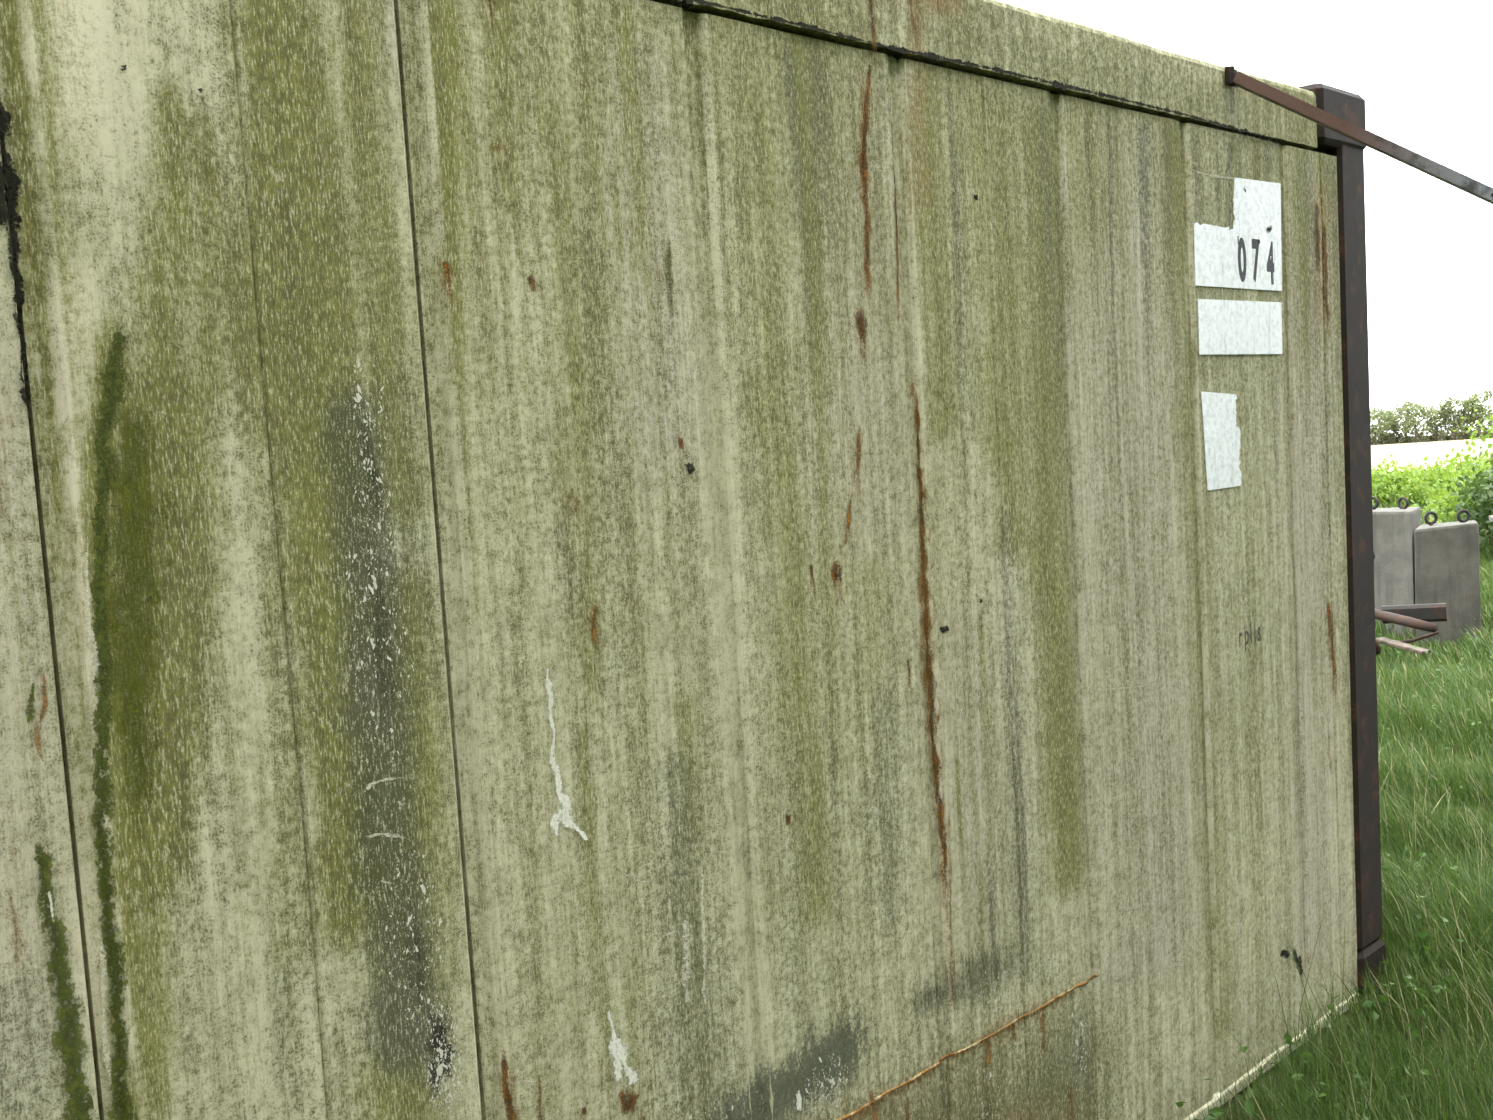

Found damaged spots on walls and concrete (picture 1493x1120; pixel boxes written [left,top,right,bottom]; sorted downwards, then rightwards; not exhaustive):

rust [855,0,877,358]
damp [97,406,170,823]
rust [908,384,954,991]
rust [618,1089,645,1120]
rust [849,990,1068,1120]